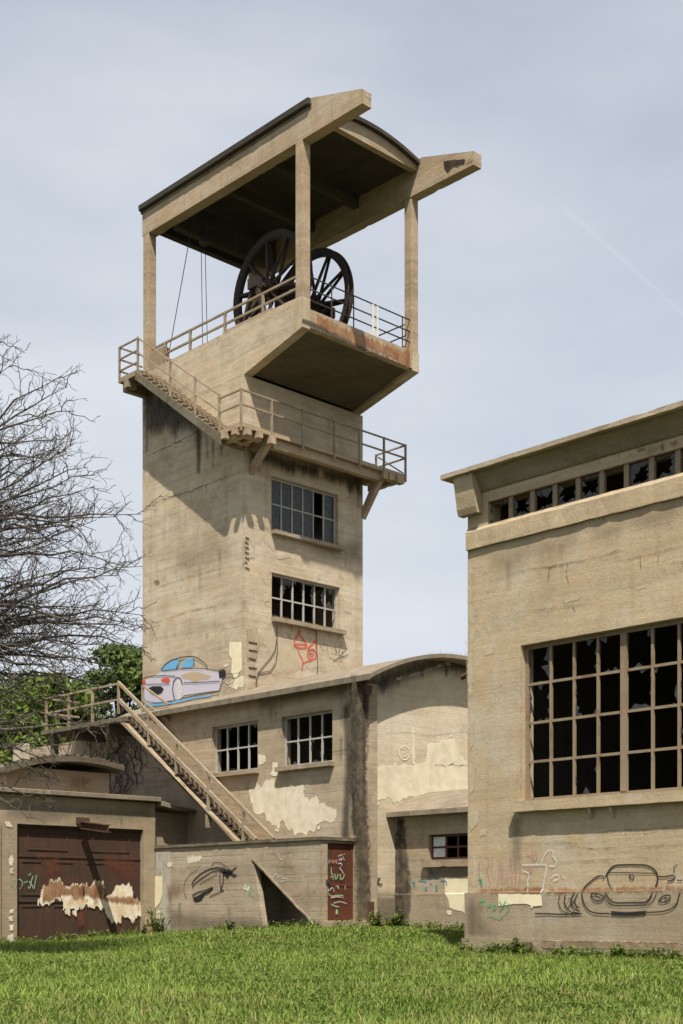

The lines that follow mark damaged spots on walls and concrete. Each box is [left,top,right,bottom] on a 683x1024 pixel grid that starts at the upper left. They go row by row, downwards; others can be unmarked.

corrosion [318,315,410,367]
leakage [145,389,201,470]
peeling [467,563,478,698]
peeling [249,754,337,836]
leakage [342,660,468,924]
peeling [377,719,476,806]
peeling [470,811,487,836]
corrosion [43,880,141,905]
peeling [37,877,161,933]